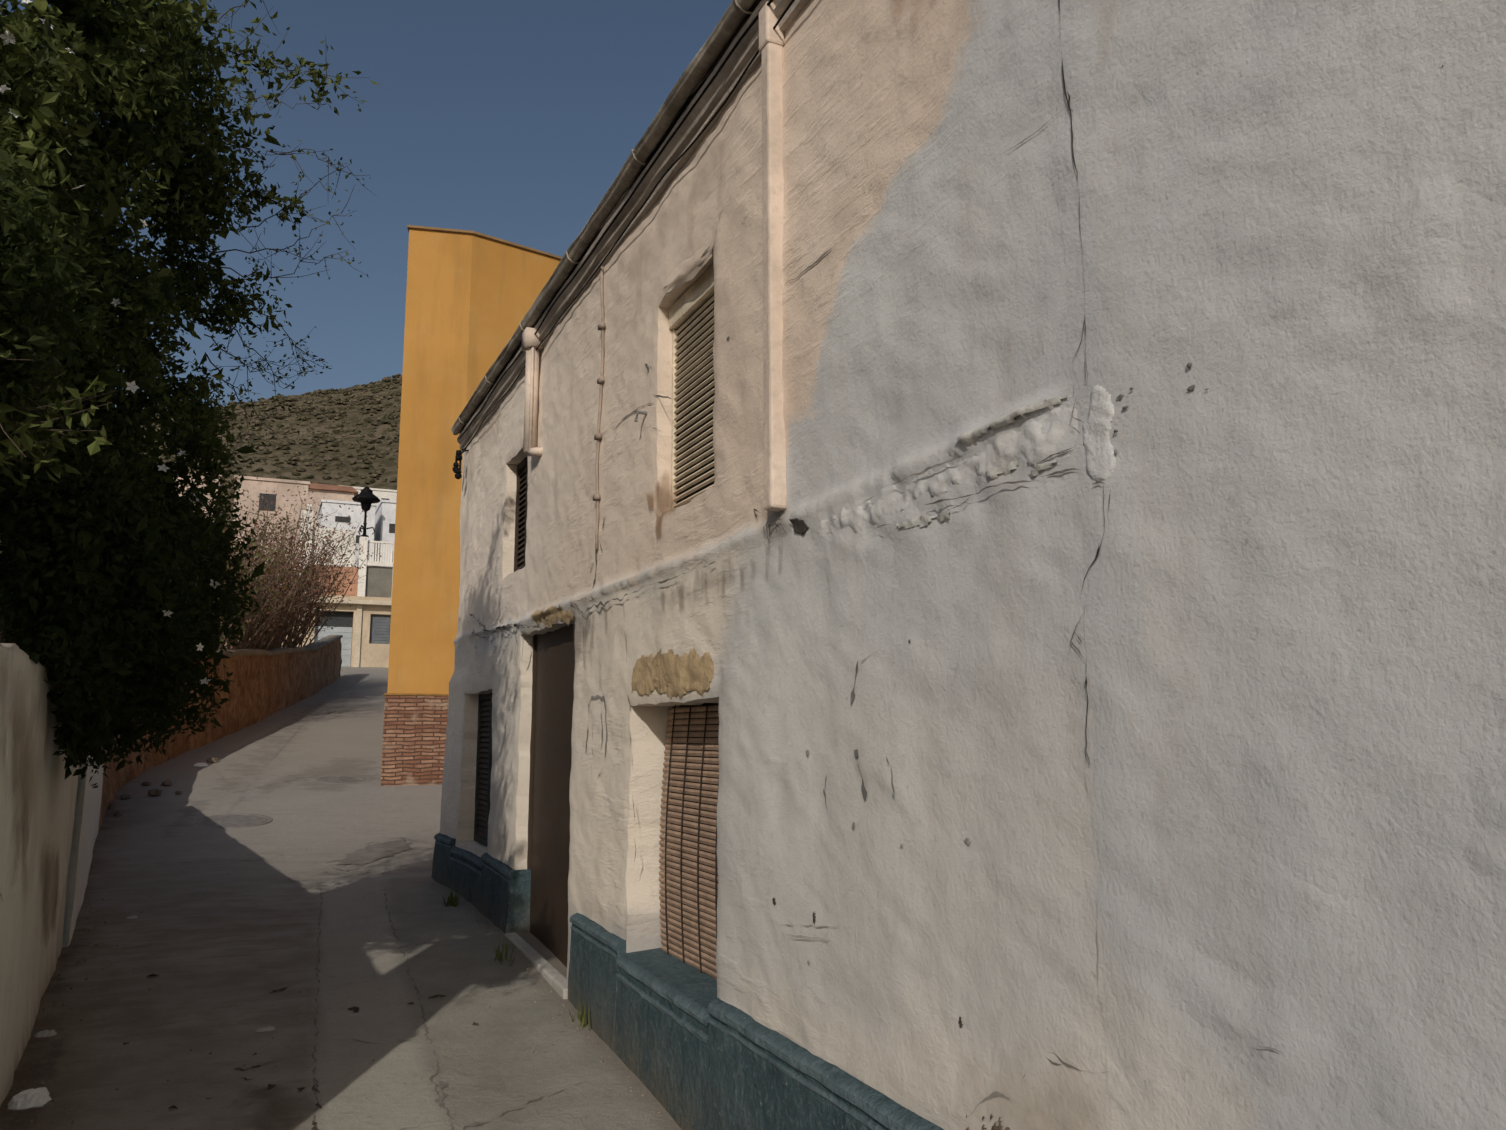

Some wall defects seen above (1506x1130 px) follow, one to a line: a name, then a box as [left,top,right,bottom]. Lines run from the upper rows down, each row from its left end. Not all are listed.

flaking render [789,391,1078,535]
crack [828,0,1111,831]
flaking render [631,648,714,698]
peeling [966,1091,1010,1130]